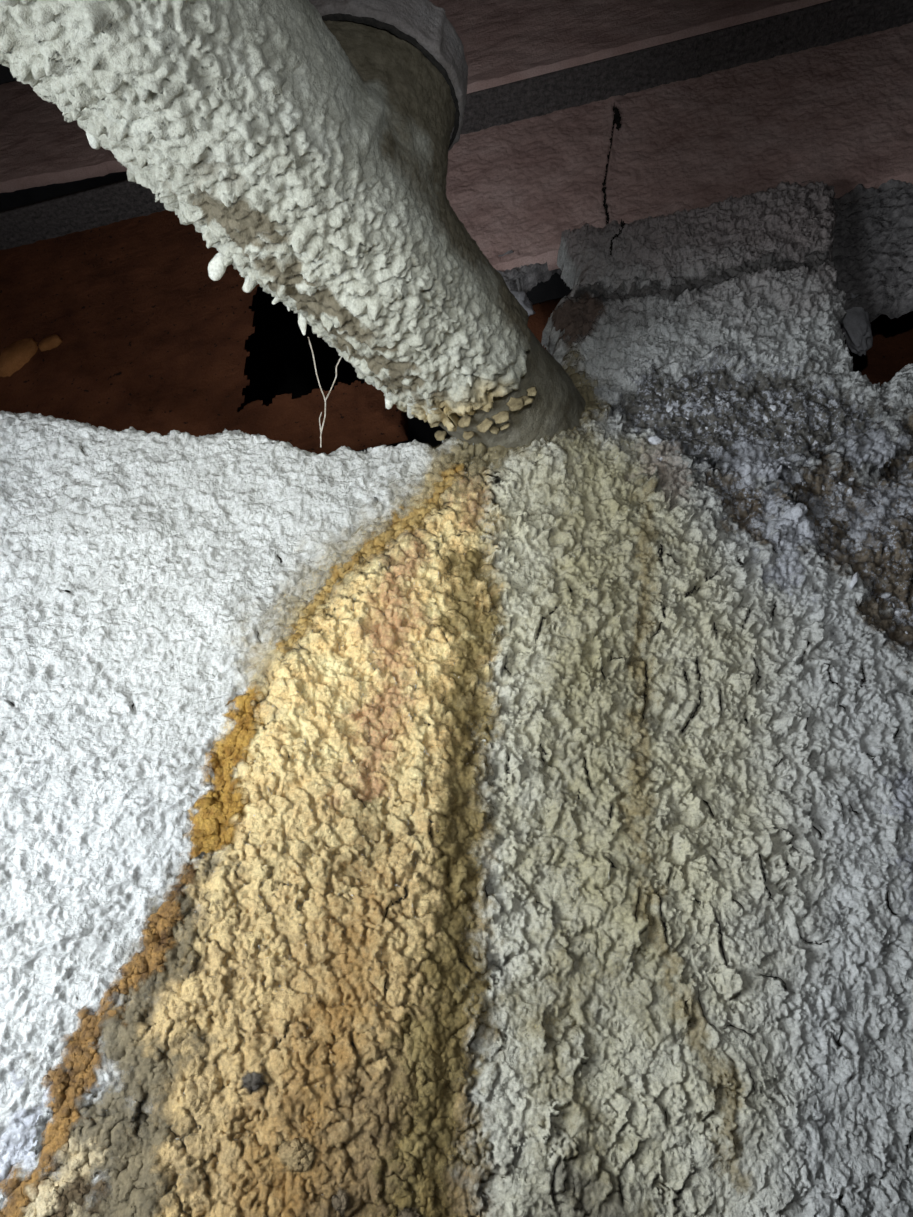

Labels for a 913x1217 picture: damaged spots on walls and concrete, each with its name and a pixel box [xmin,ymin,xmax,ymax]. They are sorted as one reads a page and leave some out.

crack [602,106,626,255]
crack [535,588,573,644]
crack [601,544,744,723]
crack [713,602,777,635]
crack [681,657,761,733]
crack [801,641,866,711]
damp [21,436,528,1217]
crack [577,757,613,824]
crack [635,869,672,942]
crack [695,798,859,966]
crack [685,988,753,1036]
crack [551,1159,561,1206]